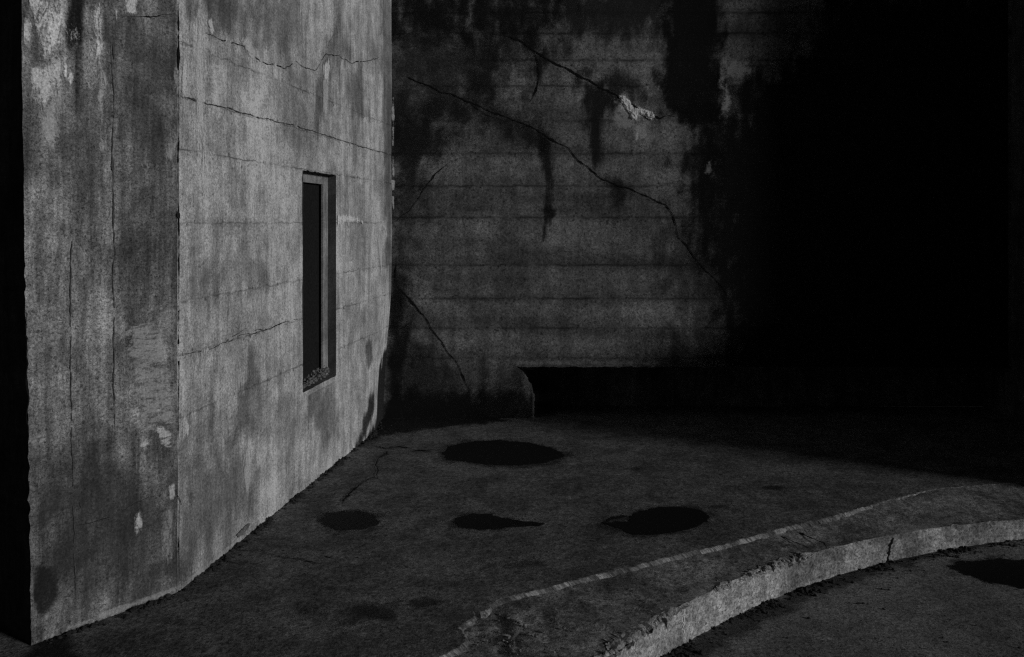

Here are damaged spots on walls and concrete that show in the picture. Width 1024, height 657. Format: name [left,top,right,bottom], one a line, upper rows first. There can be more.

damp [24,0,103,107]
damp [116,0,137,15]
crack [130,3,385,275]
crack [407,36,731,298]
spalling [619,95,655,120]
damp [391,0,1008,367]
crack [178,311,304,366]
crack [395,256,470,390]
crack [342,445,429,502]